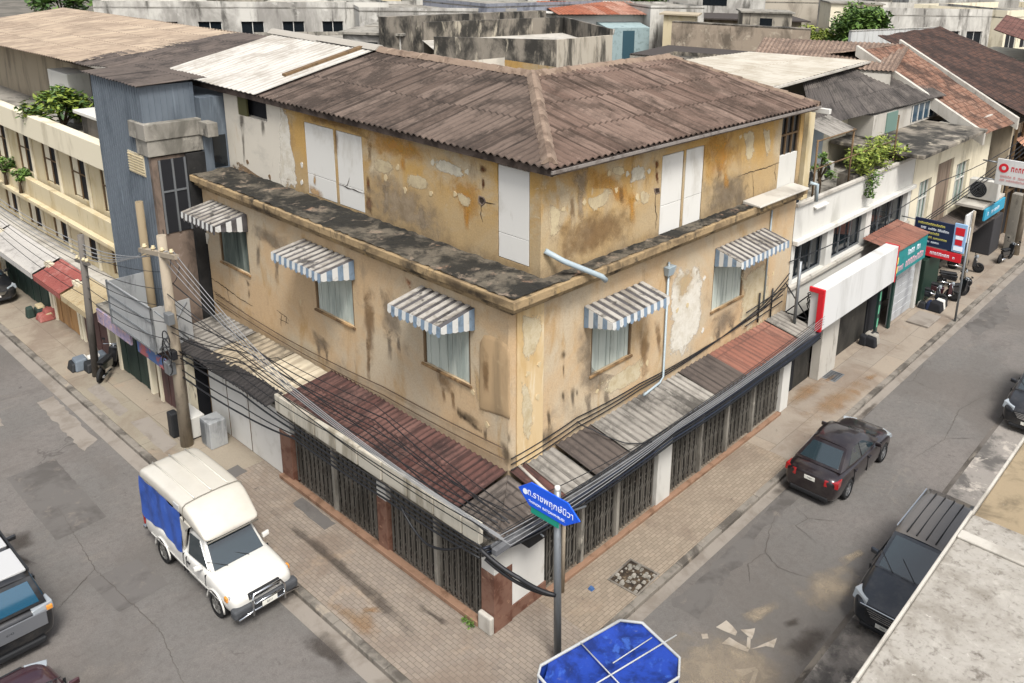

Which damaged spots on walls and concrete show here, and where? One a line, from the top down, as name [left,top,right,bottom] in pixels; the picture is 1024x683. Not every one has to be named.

peeling [374,159,433,196]
peeling [454,191,493,221]
peeling [582,167,629,211]
peeling [676,272,706,313]
peeling [522,315,542,439]